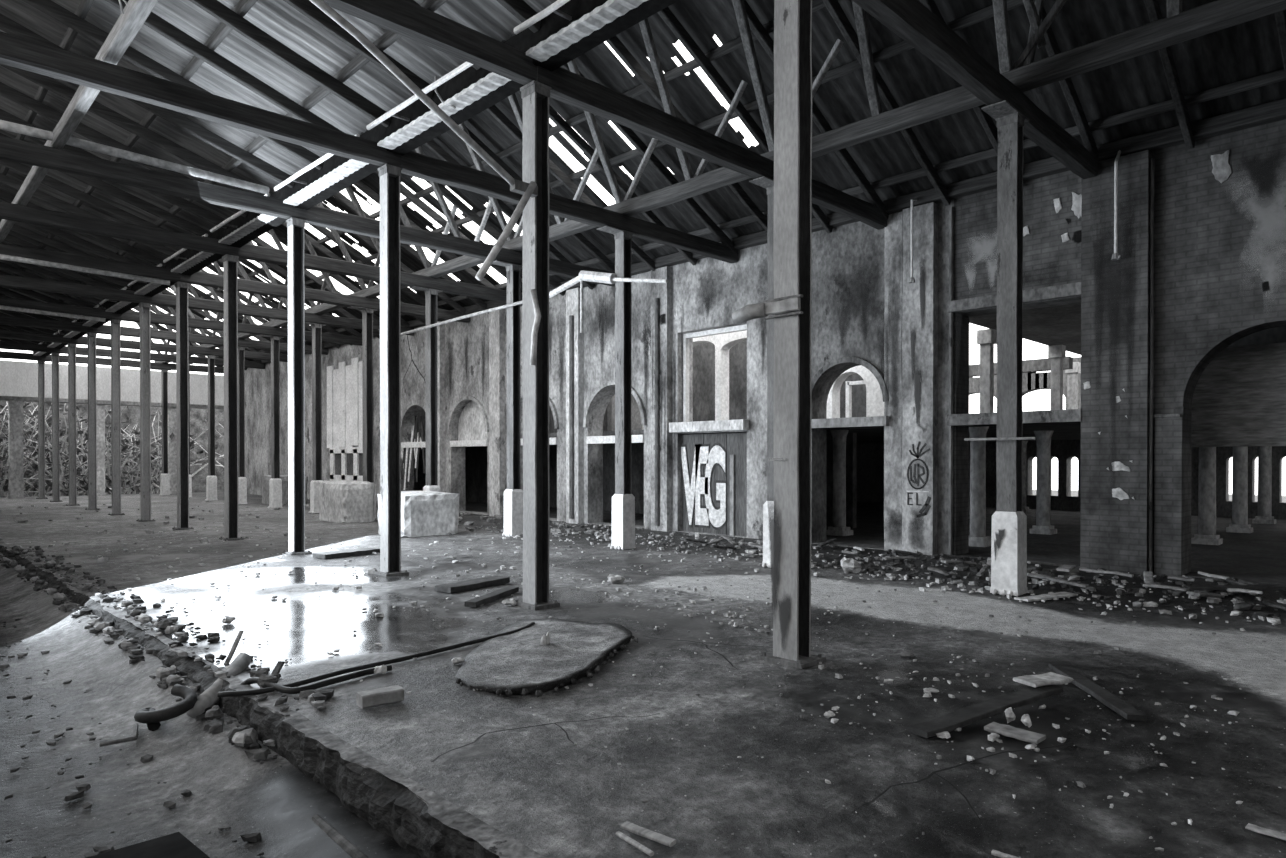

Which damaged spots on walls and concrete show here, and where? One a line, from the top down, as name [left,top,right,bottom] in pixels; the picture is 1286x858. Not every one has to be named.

peeling [1053,192,1082,219]
water stain [1240,161,1286,290]
water stain [700,277,719,314]
spalling [1107,460,1133,471]
spalling [1112,487,1135,500]